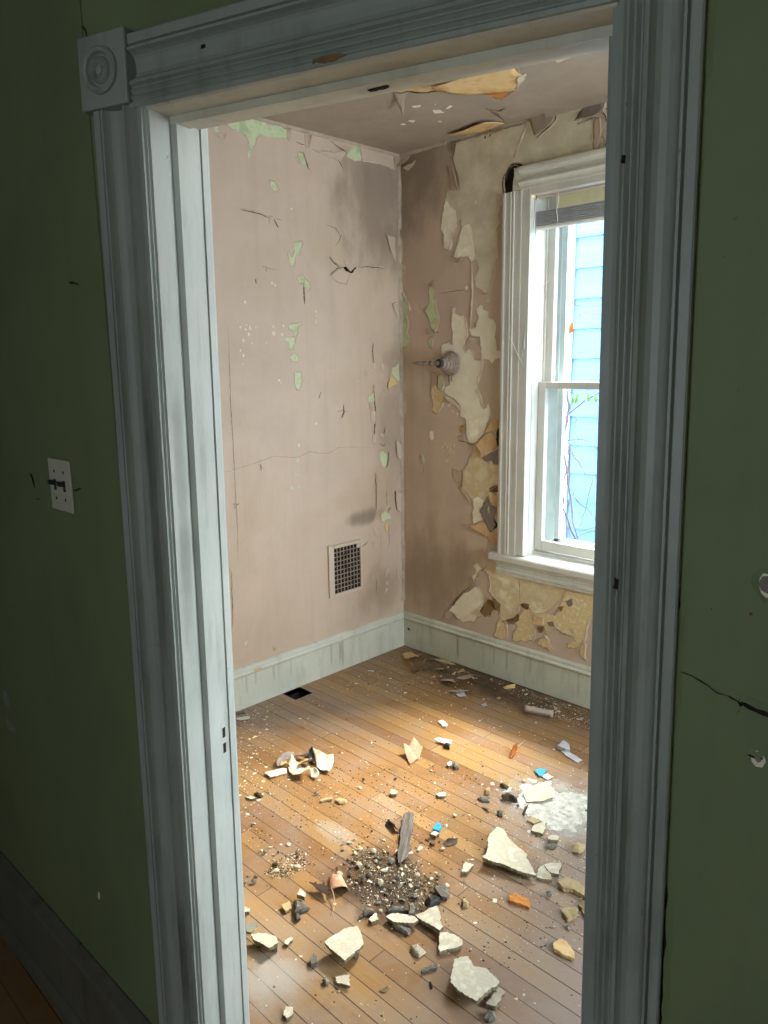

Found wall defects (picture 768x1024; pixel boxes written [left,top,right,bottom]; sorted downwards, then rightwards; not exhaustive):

crack [704,0,716,78]
peeling [368,85,452,125]
crack [240,208,281,227]
crack [697,159,705,185]
peeling [212,119,415,600]
spalling [424,102,607,532]
spalling [441,562,593,661]
crack [672,587,768,749]
spalling [748,747,766,768]
crack [660,887,675,1024]